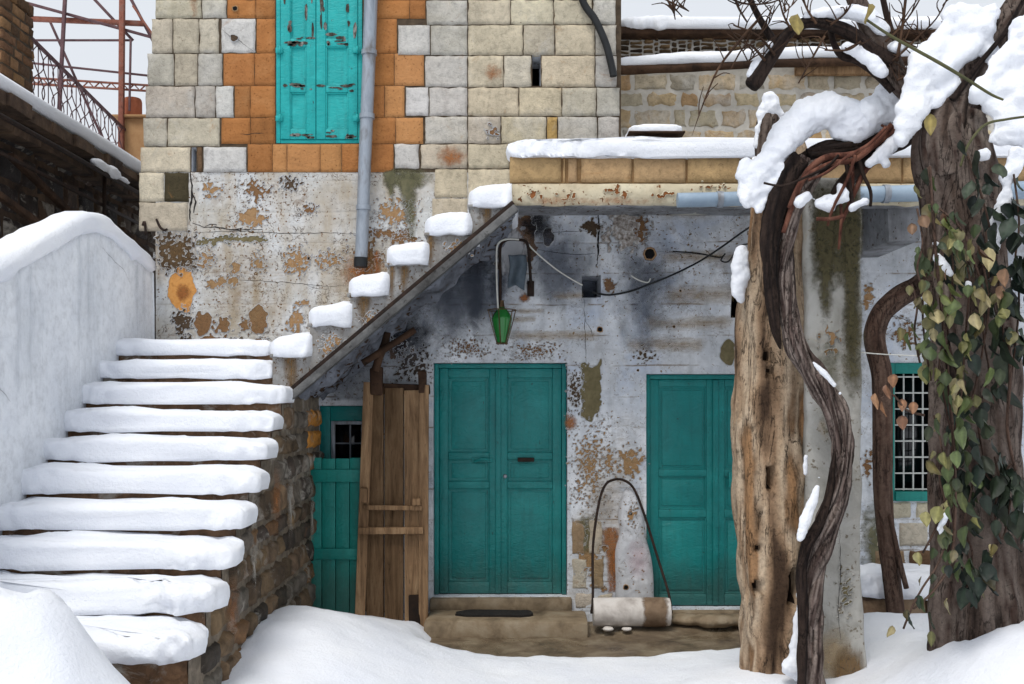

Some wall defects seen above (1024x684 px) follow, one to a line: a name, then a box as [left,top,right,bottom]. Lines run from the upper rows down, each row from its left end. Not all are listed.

crack [189,171,354,234]
peeling [153,172,424,342]
water stain [442,229,527,323]
water stain [539,238,580,299]
peeling [383,334,649,594]